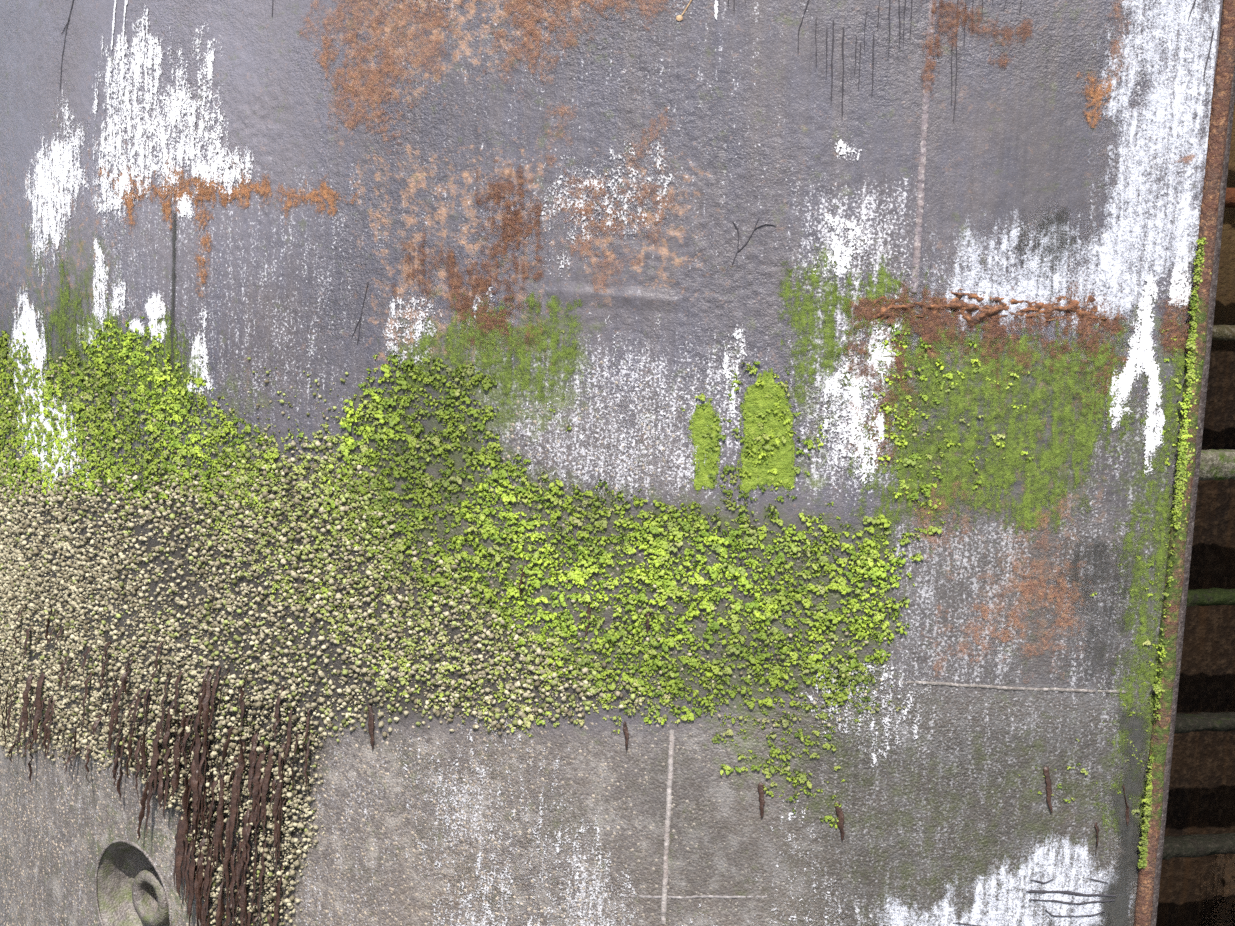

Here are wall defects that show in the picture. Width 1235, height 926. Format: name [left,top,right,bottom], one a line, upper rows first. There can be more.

rust [300,0,440,128]
damp [815,0,913,118]
rust [98,161,357,296]
rust [403,168,543,335]
damp [1038,218,1075,280]
rust [847,282,1127,465]
rust [1160,297,1192,350]